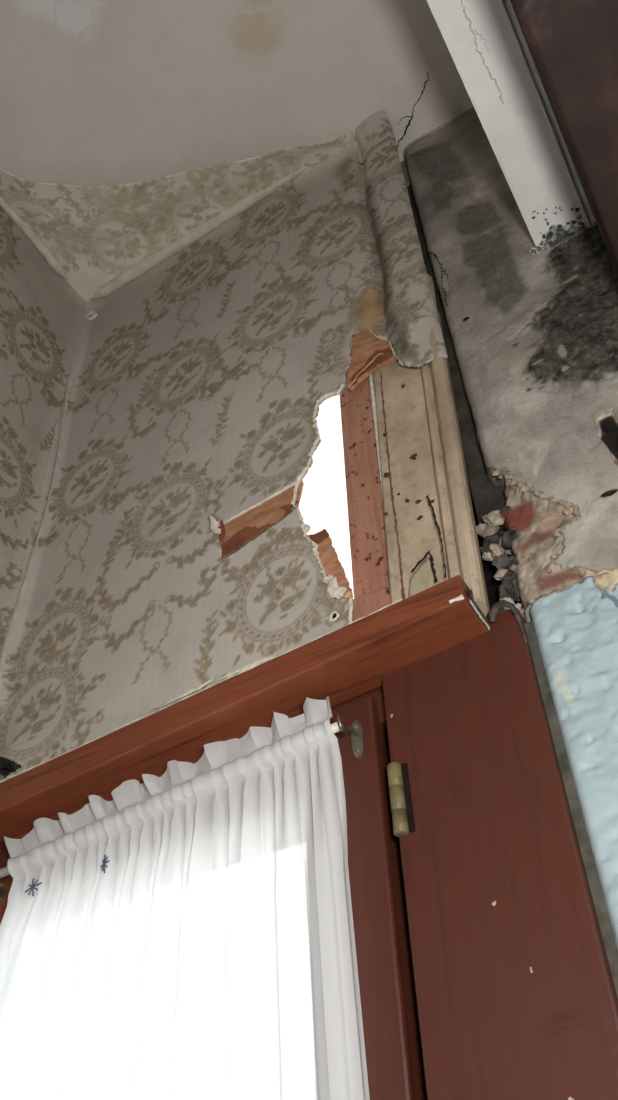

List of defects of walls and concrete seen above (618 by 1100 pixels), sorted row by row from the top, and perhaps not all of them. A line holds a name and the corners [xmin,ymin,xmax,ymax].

water stain [221,0,295,67]
crack [461,0,504,104]
crack [397,72,474,159]
mould [511,199,618,401]
peeling [366,372,435,600]
flaking render [595,411,618,464]
peeling [322,574,347,599]
flaking render [449,468,618,632]